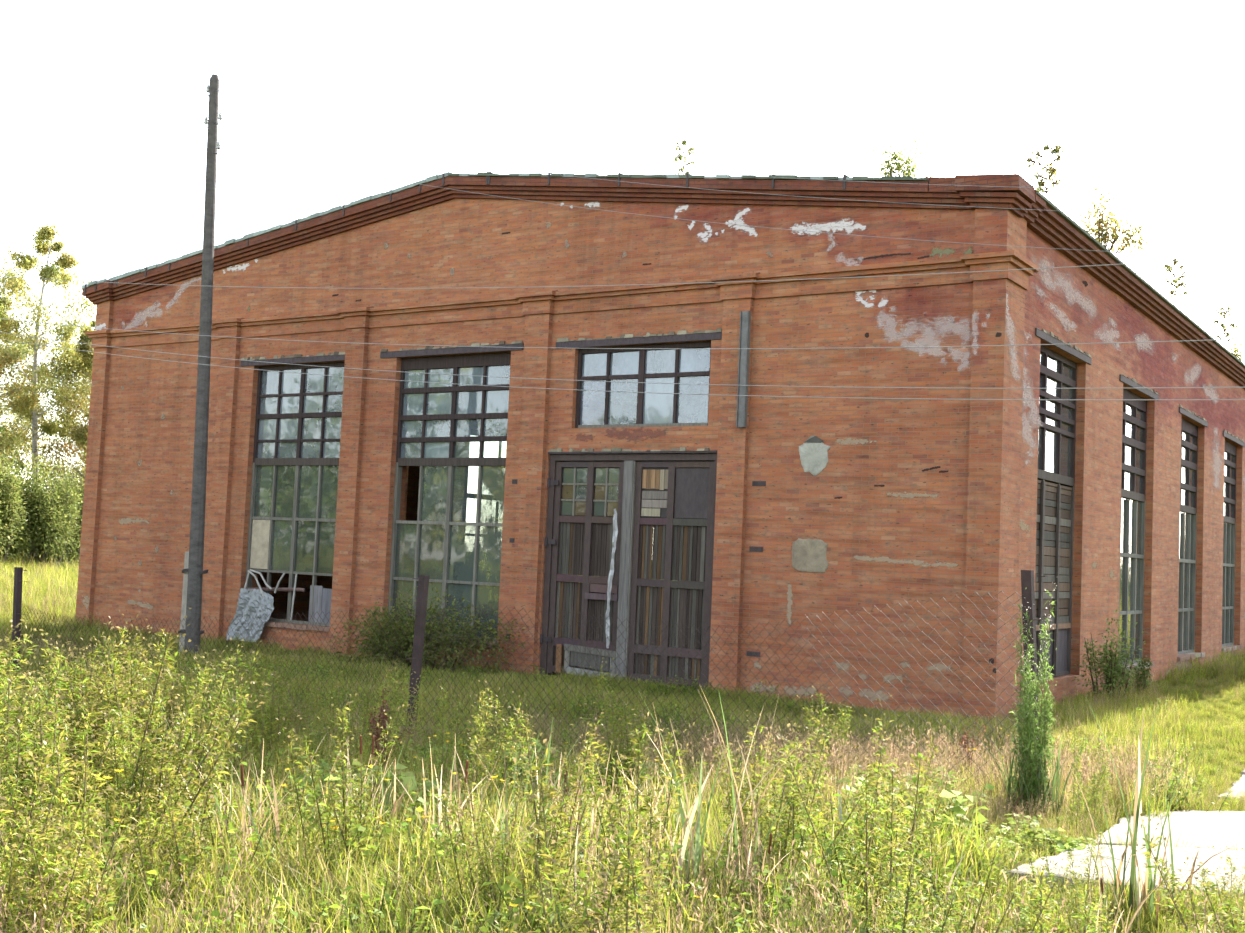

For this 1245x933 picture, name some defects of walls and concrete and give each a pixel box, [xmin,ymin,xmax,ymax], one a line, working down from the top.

leakage [855,290,889,308]